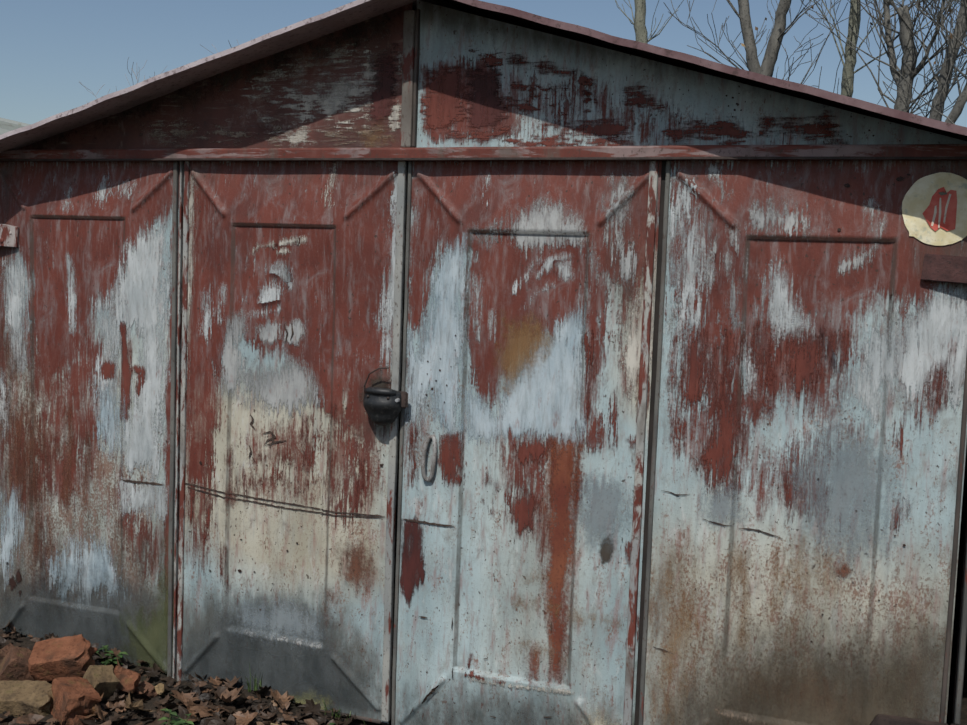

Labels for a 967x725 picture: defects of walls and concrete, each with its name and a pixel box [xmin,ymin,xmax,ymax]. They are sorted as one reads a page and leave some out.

peeling [240,43,401,146]
peeling [420,46,633,147]
peeling [0,257,30,439]
peeling [89,223,172,521]
peeling [187,176,337,495]
peeling [404,199,599,486]
peeling [602,173,656,447]
peeling [663,160,967,494]
water stain [3,586,140,663]
peeling [46,531,125,608]
water stain [186,611,360,706]
water stain [718,653,924,725]